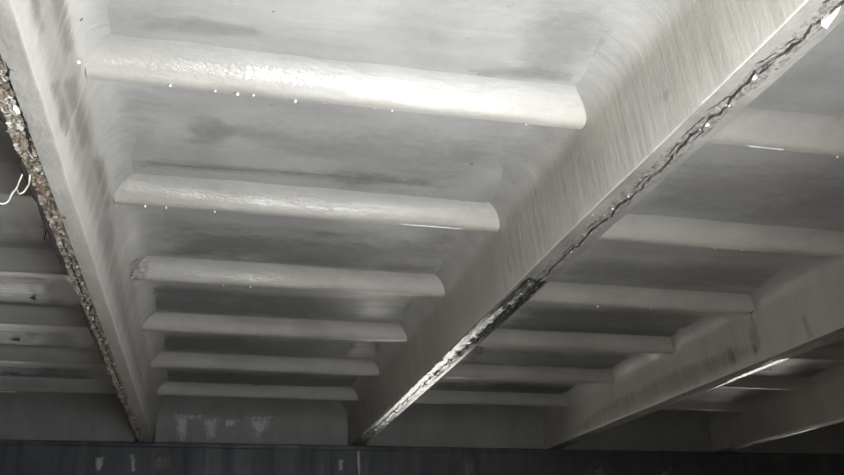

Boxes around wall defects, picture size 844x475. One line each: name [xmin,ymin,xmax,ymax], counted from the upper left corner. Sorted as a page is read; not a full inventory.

spalling [0,55,144,442]
crack [365,0,844,436]